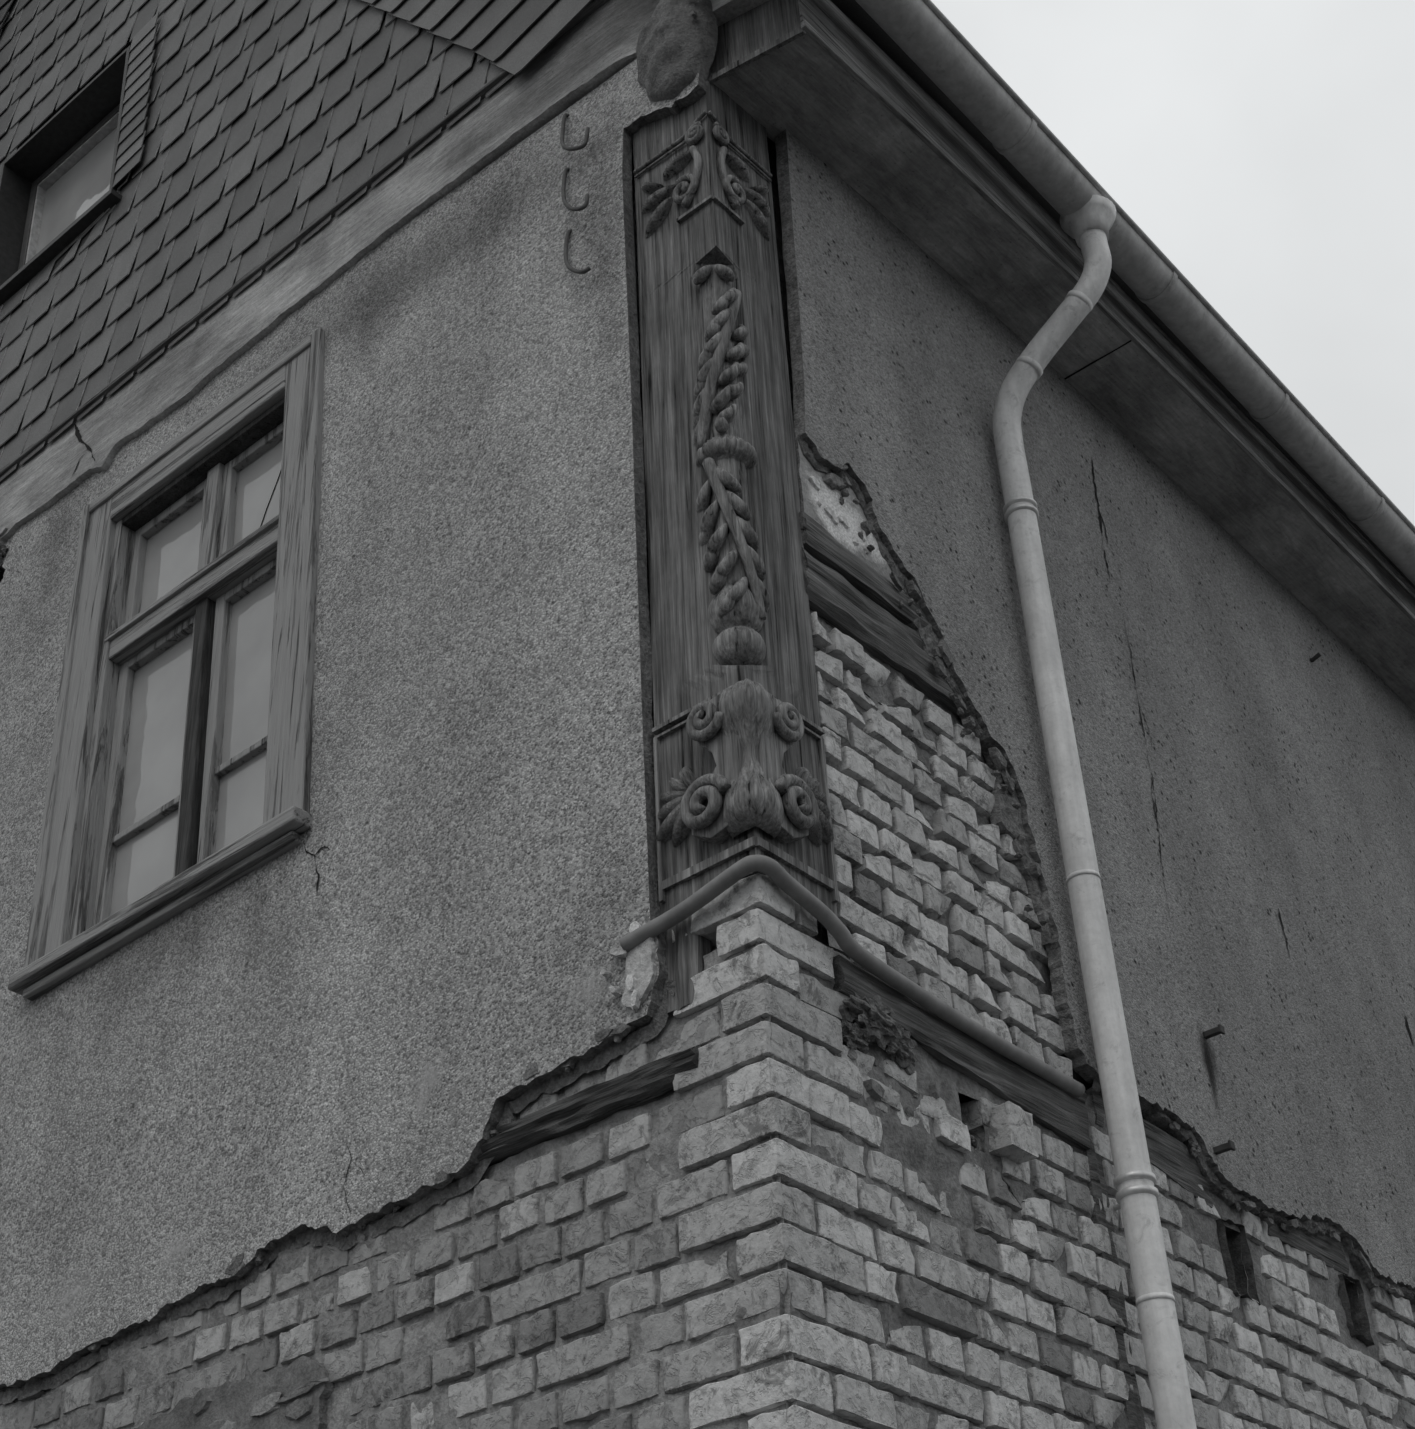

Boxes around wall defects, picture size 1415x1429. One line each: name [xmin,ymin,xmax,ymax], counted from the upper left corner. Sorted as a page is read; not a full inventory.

crack [73,424,95,474]
flaking render [0,528,9,582]
crack [1092,460,1110,578]
flaking render [795,435,1052,945]
crack [303,842,330,891]
flaking render [490,915,676,1137]
spalling [837,992,950,1119]
flaking render [1084,1079,1103,1099]
flaking render [0,1153,494,1405]
flaking render [1140,1103,1415,1347]